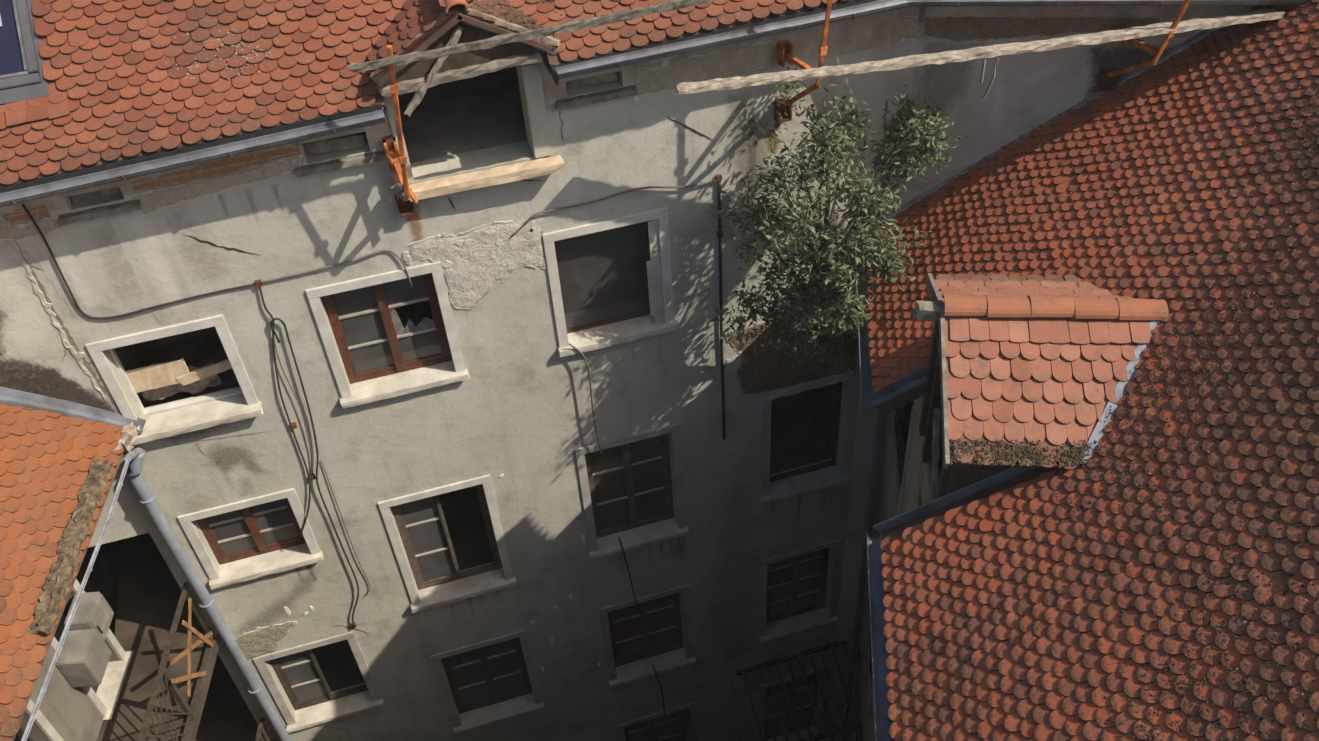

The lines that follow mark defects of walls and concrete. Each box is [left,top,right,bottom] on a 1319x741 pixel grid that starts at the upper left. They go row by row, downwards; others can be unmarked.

flaking render [129,142,303,219]
leakage [0,183,260,413]
spalling [402,218,546,310]